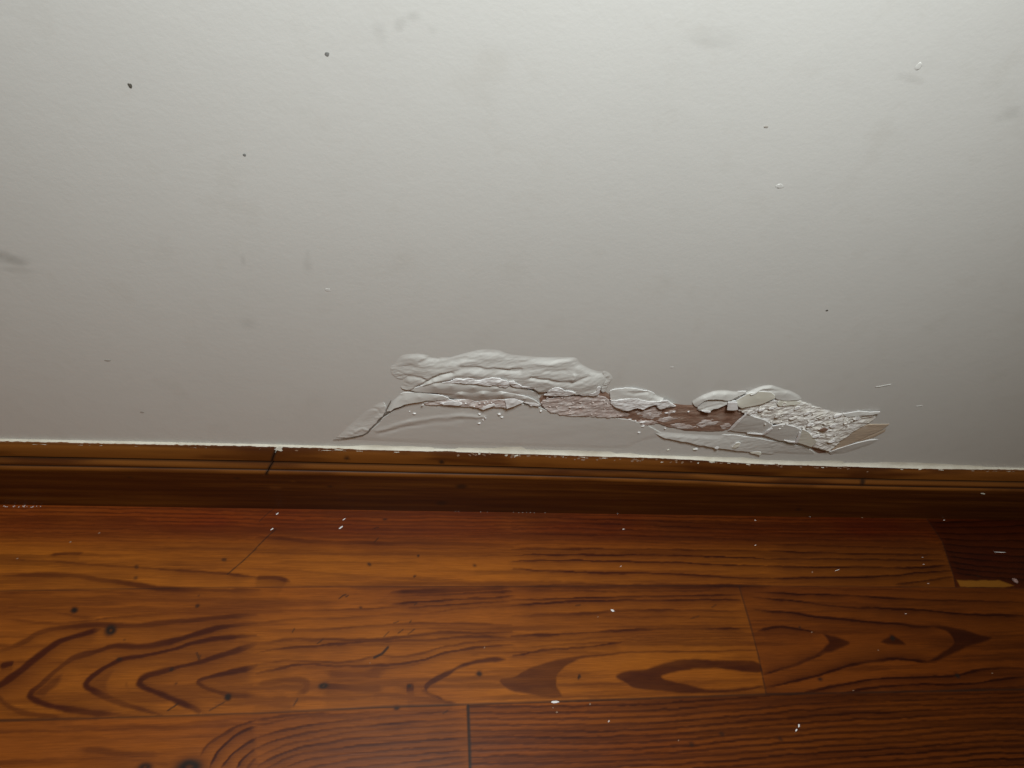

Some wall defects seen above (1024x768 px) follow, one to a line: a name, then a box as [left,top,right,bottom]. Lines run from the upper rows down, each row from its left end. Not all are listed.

peeling [539,385,889,456]